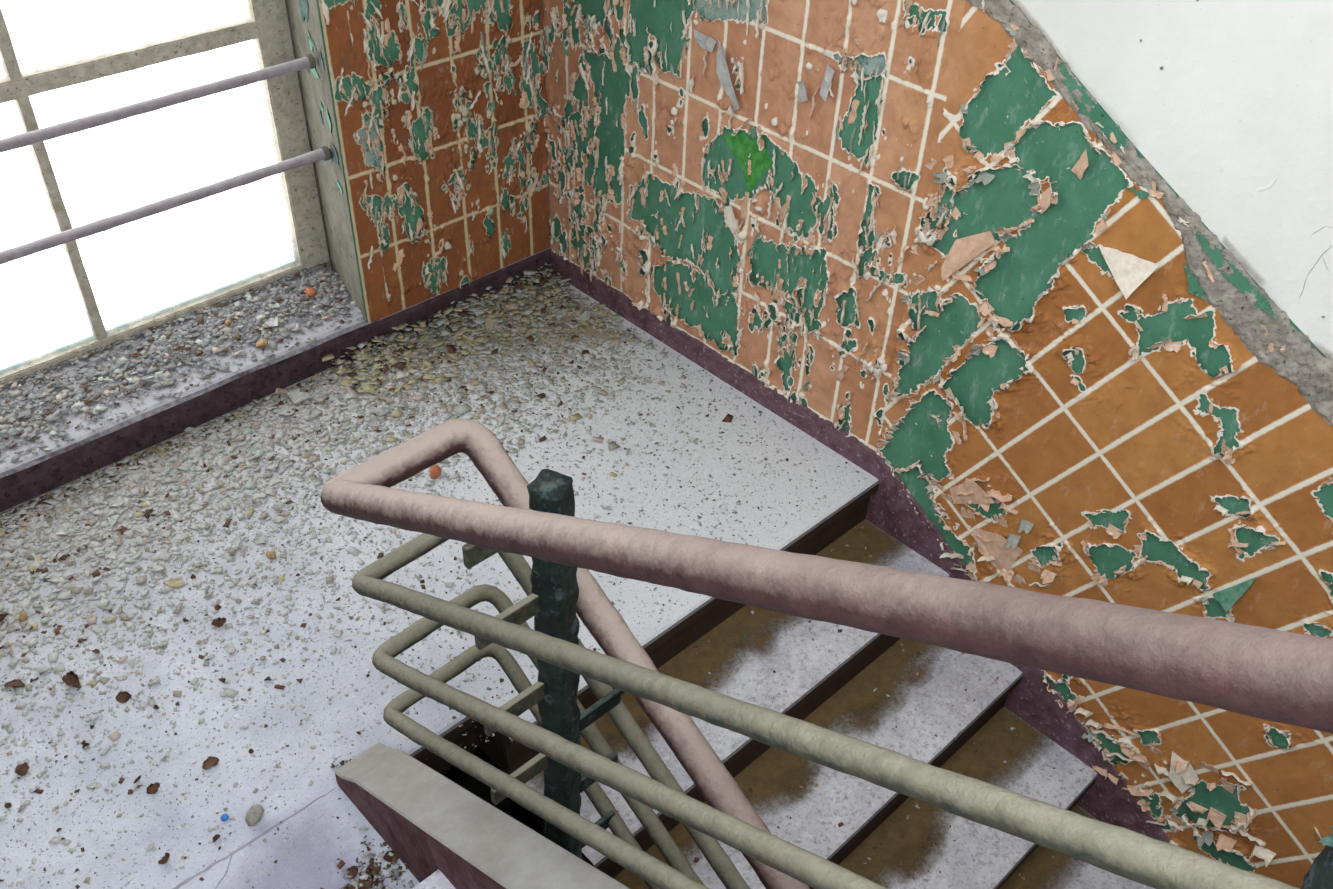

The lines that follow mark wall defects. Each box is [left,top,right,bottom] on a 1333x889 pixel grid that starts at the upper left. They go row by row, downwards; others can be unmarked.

flaking render [299,0,1333,588]
peeling [262,316,278,328]
peeling [277,391,311,416]
peeling [1080,510,1257,621]
peeling [1303,622,1331,637]
peeling [1266,725,1289,748]
peeling [1044,672,1276,872]
peeling [1314,826,1333,847]